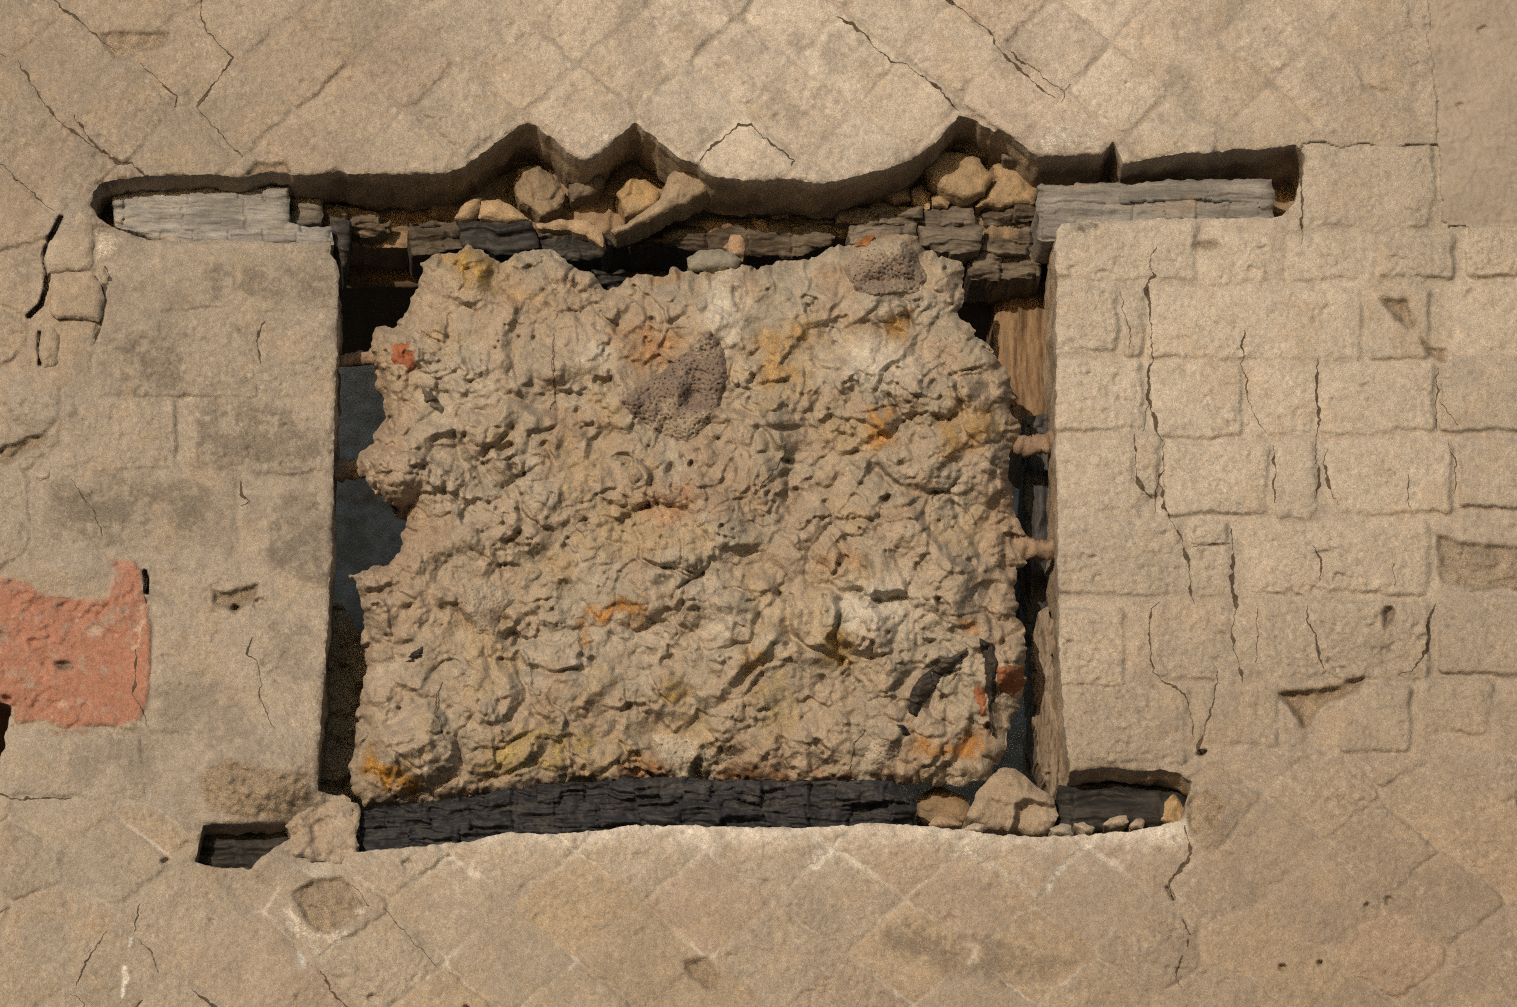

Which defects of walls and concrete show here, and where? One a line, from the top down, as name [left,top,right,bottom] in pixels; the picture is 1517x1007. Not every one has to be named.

spalling [246,162,288,176]
crack [2,164,61,364]
crack [1120,247,1259,755]
spalling [1436,536,1517,588]
crack [71,903,158,1007]
crack [191,988,217,1007]
crack [1167,825,1192,988]